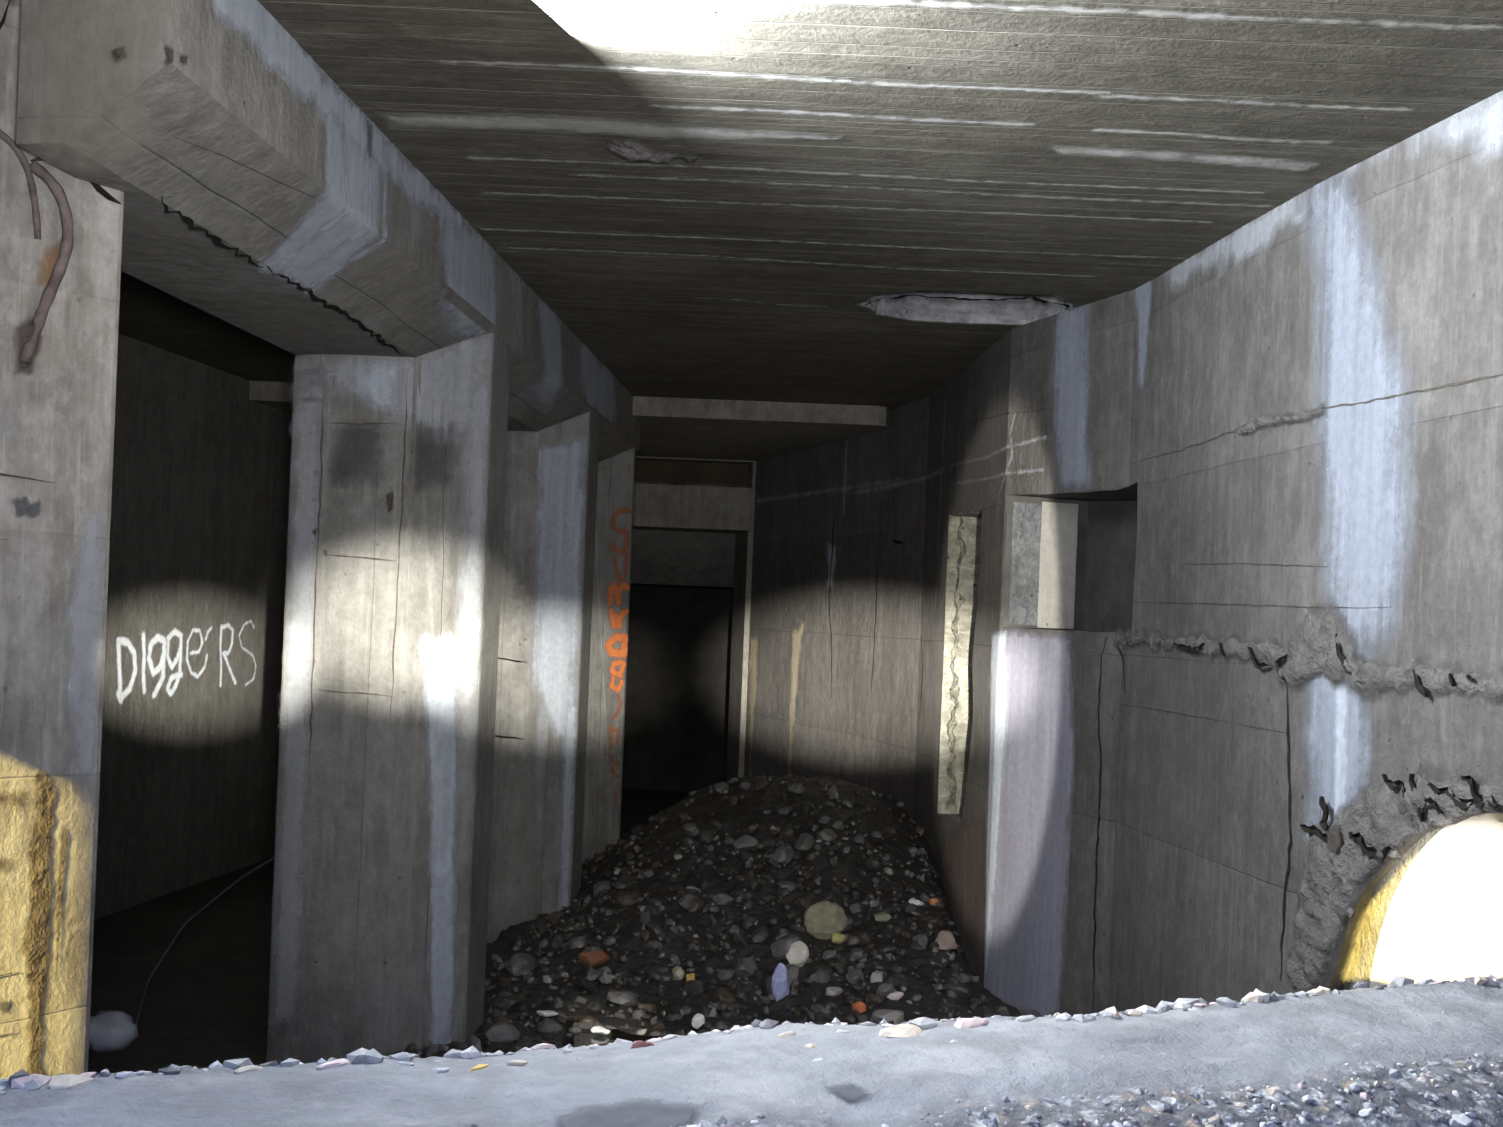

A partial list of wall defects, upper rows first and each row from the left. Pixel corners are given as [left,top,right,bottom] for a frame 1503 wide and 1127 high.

spalling [859,291,1074,325]
spalling [1113,605,1503,702]
spalling [1285,765,1503,993]